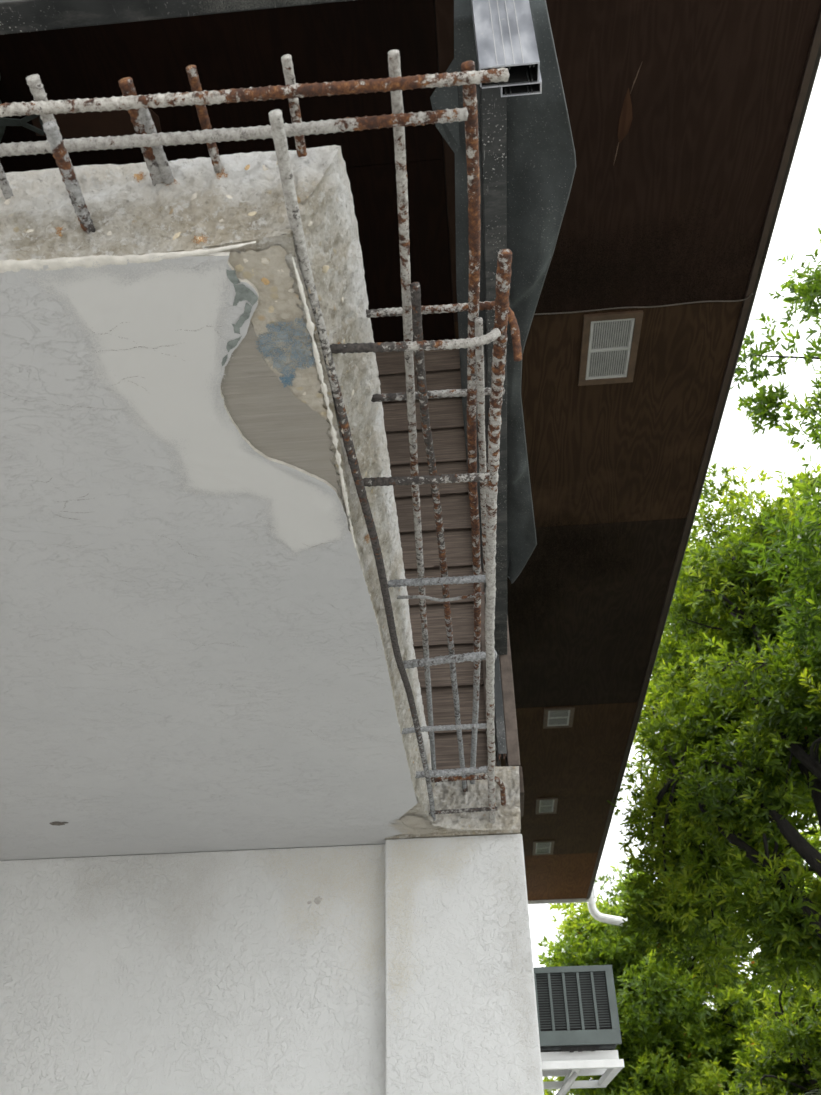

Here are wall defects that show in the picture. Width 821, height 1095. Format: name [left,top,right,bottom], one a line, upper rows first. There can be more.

spalling [0,145,521,836]